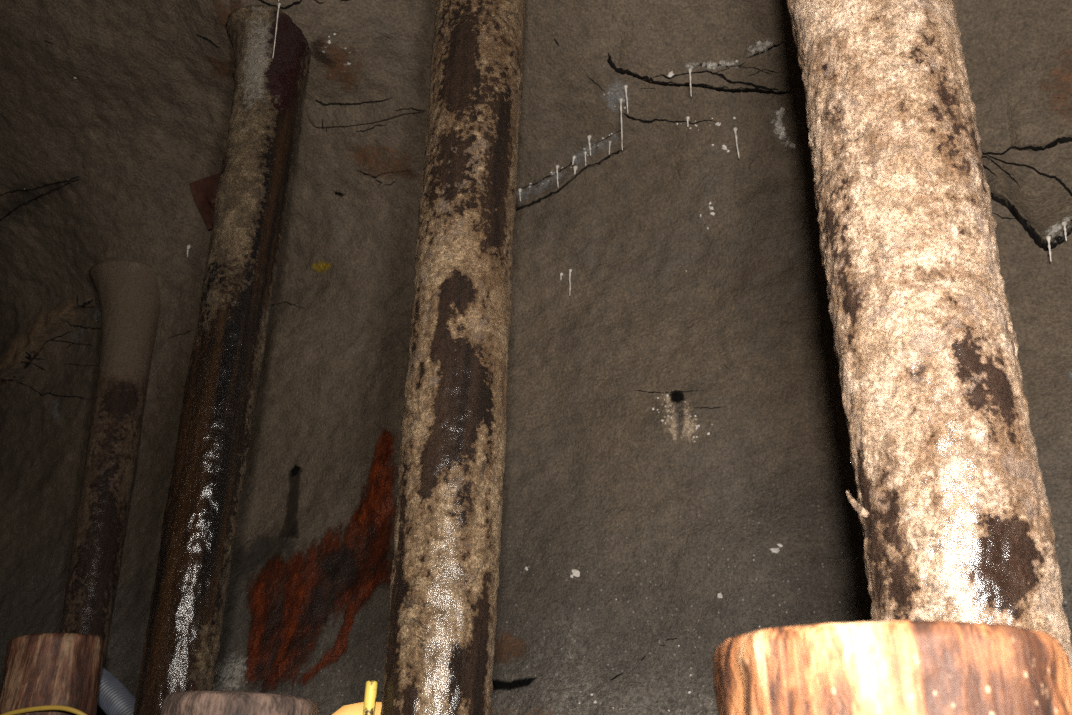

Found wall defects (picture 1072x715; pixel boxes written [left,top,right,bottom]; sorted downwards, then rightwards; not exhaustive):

crack [259,0,348,10]
crack [588,42,790,95]
leakage [686,60,739,69]
leakage [748,40,773,54]
leakage [771,107,796,148]
crack [515,113,715,211]
crack [982,137,1072,251]
corrosion [245,429,398,692]